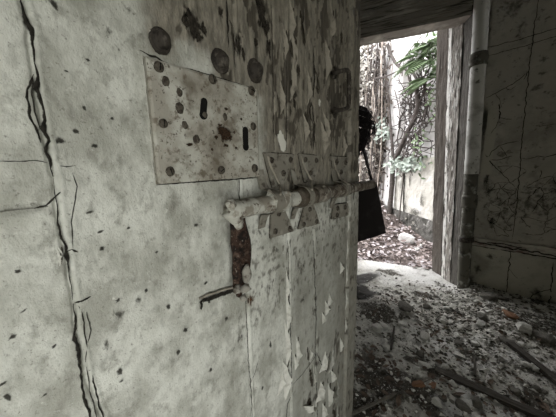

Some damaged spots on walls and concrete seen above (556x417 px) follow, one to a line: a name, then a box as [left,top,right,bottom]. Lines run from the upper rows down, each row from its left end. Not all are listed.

peeling [181,8,207,42]
peeling [235,34,245,61]
peeling [256,0,271,60]
peeling [274,0,310,142]
peeling [307,2,343,106]
corrosion [214,124,235,147]
spalling [278,130,286,152]
peeling [320,112,331,155]
crack [473,0,556,302]
crack [3,0,104,417]
peeling [277,271,344,417]